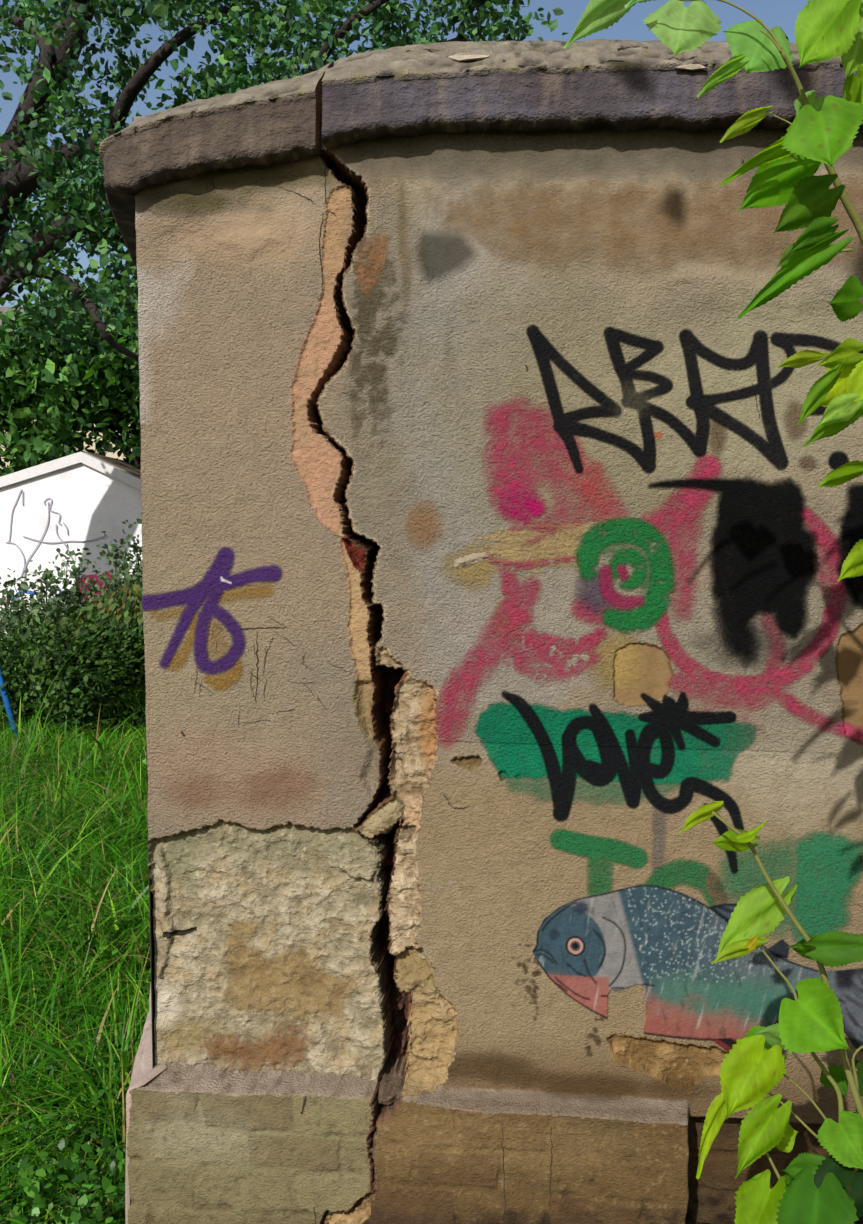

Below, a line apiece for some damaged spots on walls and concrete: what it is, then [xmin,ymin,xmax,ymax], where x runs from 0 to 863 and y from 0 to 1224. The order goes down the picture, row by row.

crack [227,627,286,701]
spalling [148,184,482,1097]
crack [279,148,412,1224]
peeling [596,637,636,685]
crack [162,926,197,939]
spalling [606,1032,729,1095]
spalling [321,1193,372,1224]